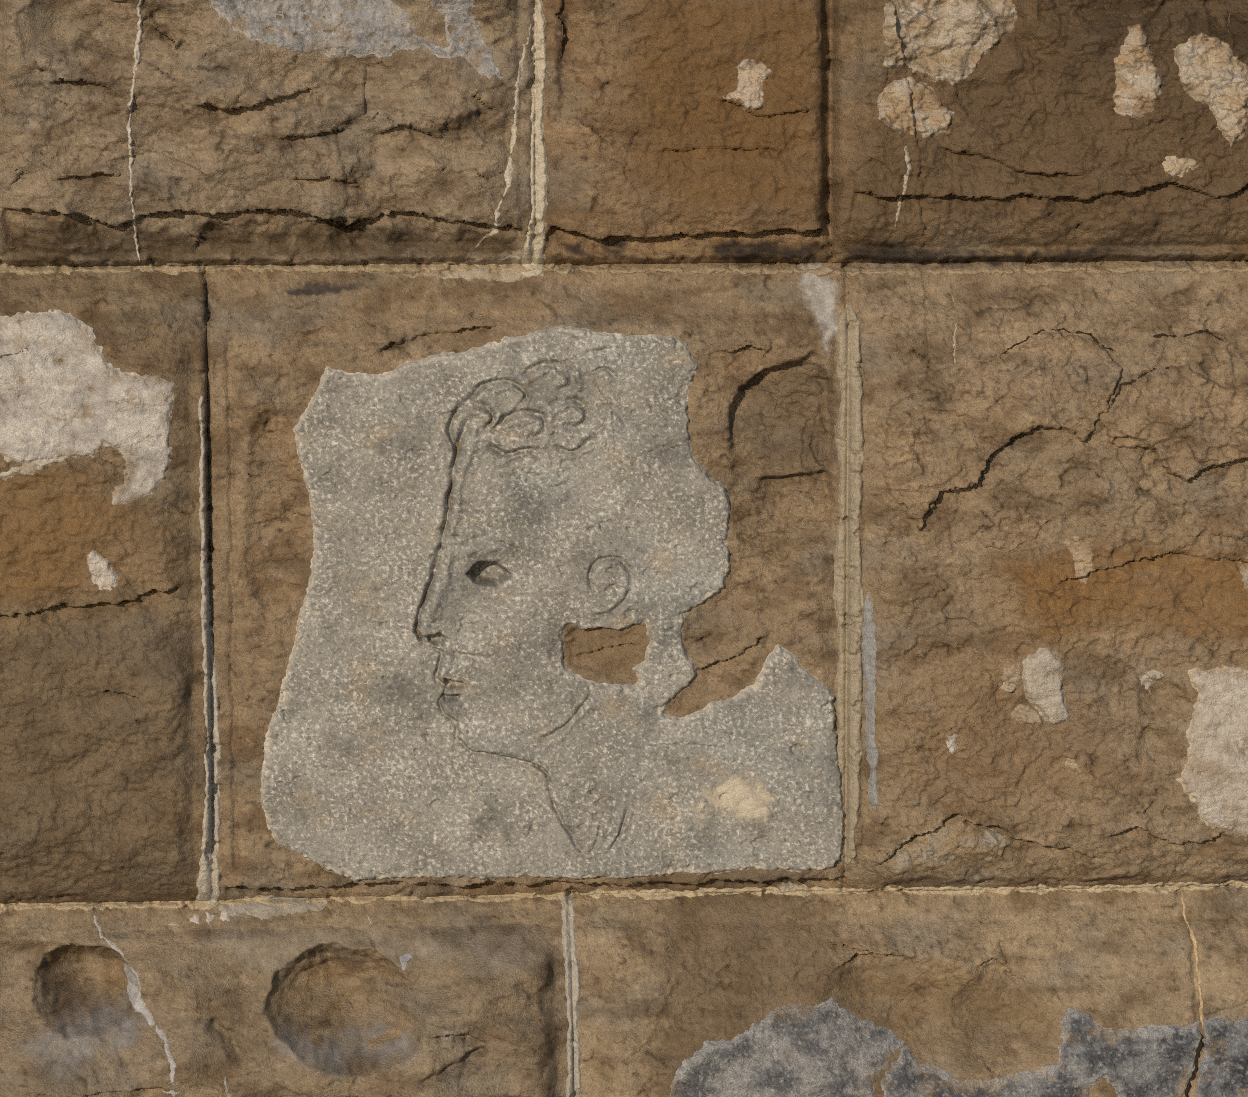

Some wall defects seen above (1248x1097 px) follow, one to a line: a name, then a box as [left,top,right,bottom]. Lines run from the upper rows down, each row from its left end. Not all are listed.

crack [126,0,143,262]
spalling [968,0,1248,186]
peeling [0,456,66,481]
crack [94,915,180,1097]
crack [1181,892,1204,1097]